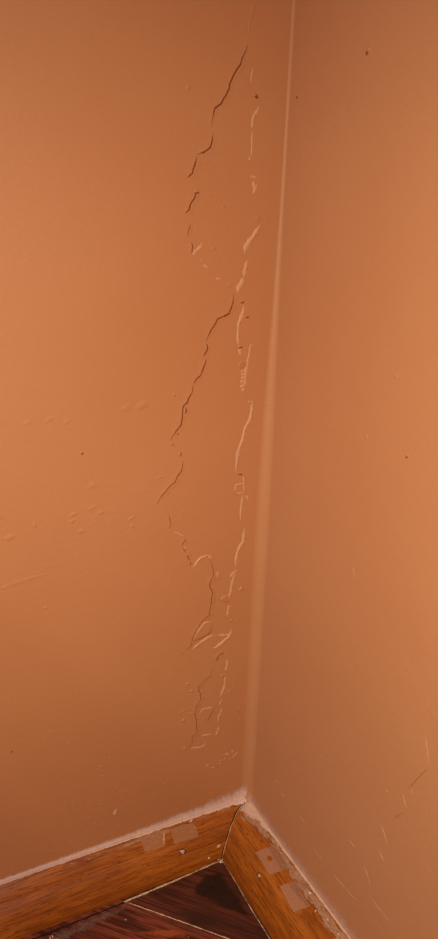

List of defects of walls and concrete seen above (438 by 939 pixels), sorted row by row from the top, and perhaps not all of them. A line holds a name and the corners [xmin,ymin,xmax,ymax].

crack [182,44,248,216]
crack [168,294,237,441]